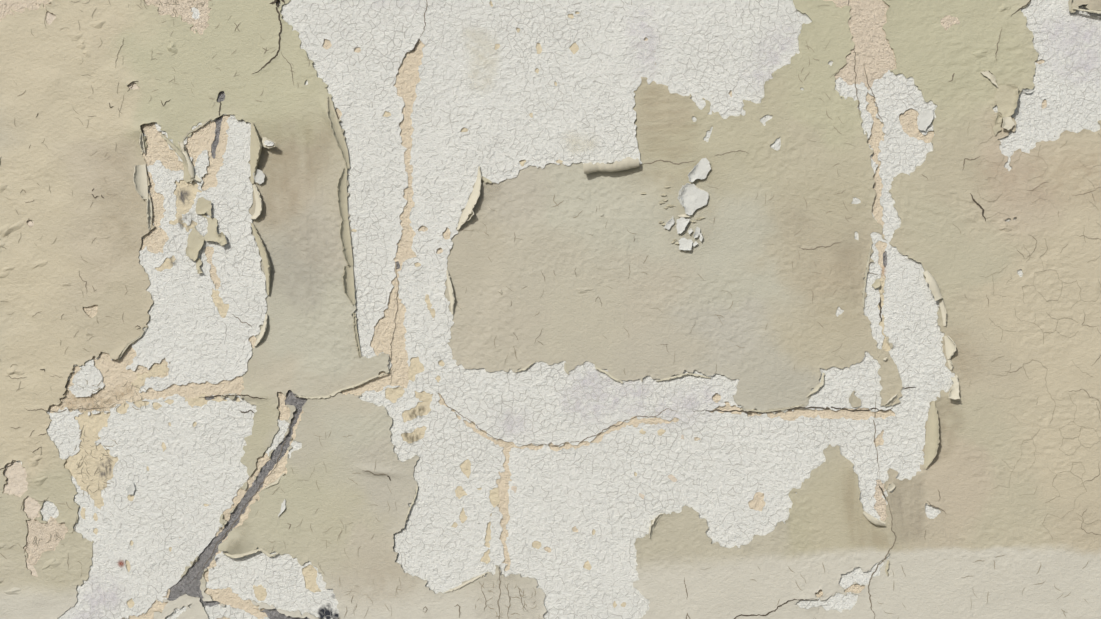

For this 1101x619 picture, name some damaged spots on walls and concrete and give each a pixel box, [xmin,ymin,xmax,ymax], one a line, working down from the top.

crack [62,0,310,127]
peeling [47,114,339,619]
crack [494,273,576,359]
crack [553,194,648,306]
peeling [276,0,960,619]
crack [792,41,885,327]
crack [963,124,1101,617]
peeling [981,0,1101,171]
peeling [3,461,59,522]
crack [192,417,402,618]
crack [436,387,916,619]